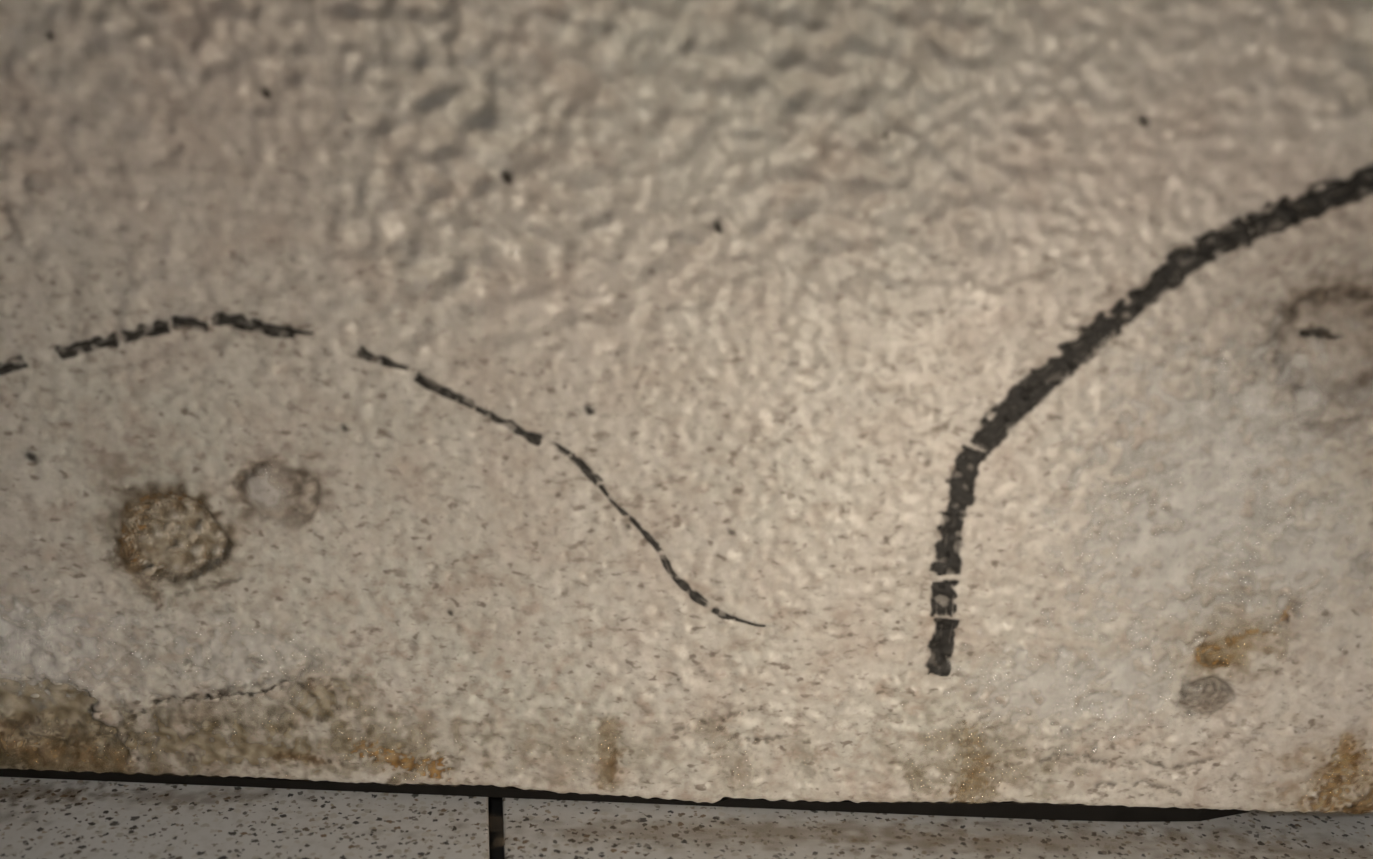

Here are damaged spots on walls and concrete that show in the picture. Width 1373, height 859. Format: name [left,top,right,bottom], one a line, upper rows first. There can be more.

rust [1301,742,1373,814]